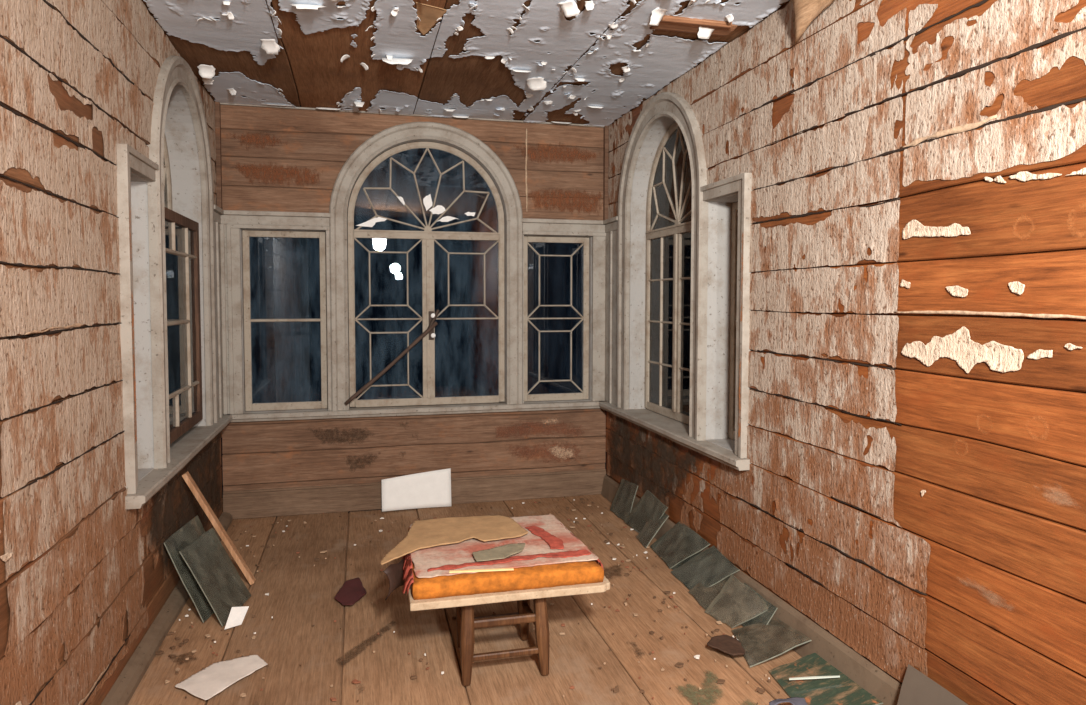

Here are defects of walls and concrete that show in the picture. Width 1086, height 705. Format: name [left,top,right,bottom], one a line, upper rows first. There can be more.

peeling [0,0,297,705]
peeling [278,0,1086,683]